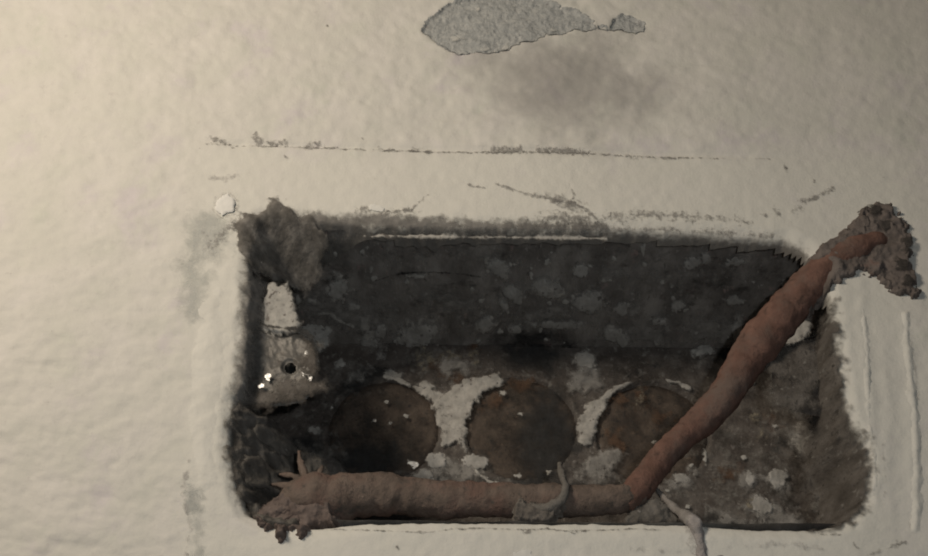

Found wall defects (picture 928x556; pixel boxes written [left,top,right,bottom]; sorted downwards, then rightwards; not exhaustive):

peeling [421,0,645,55]